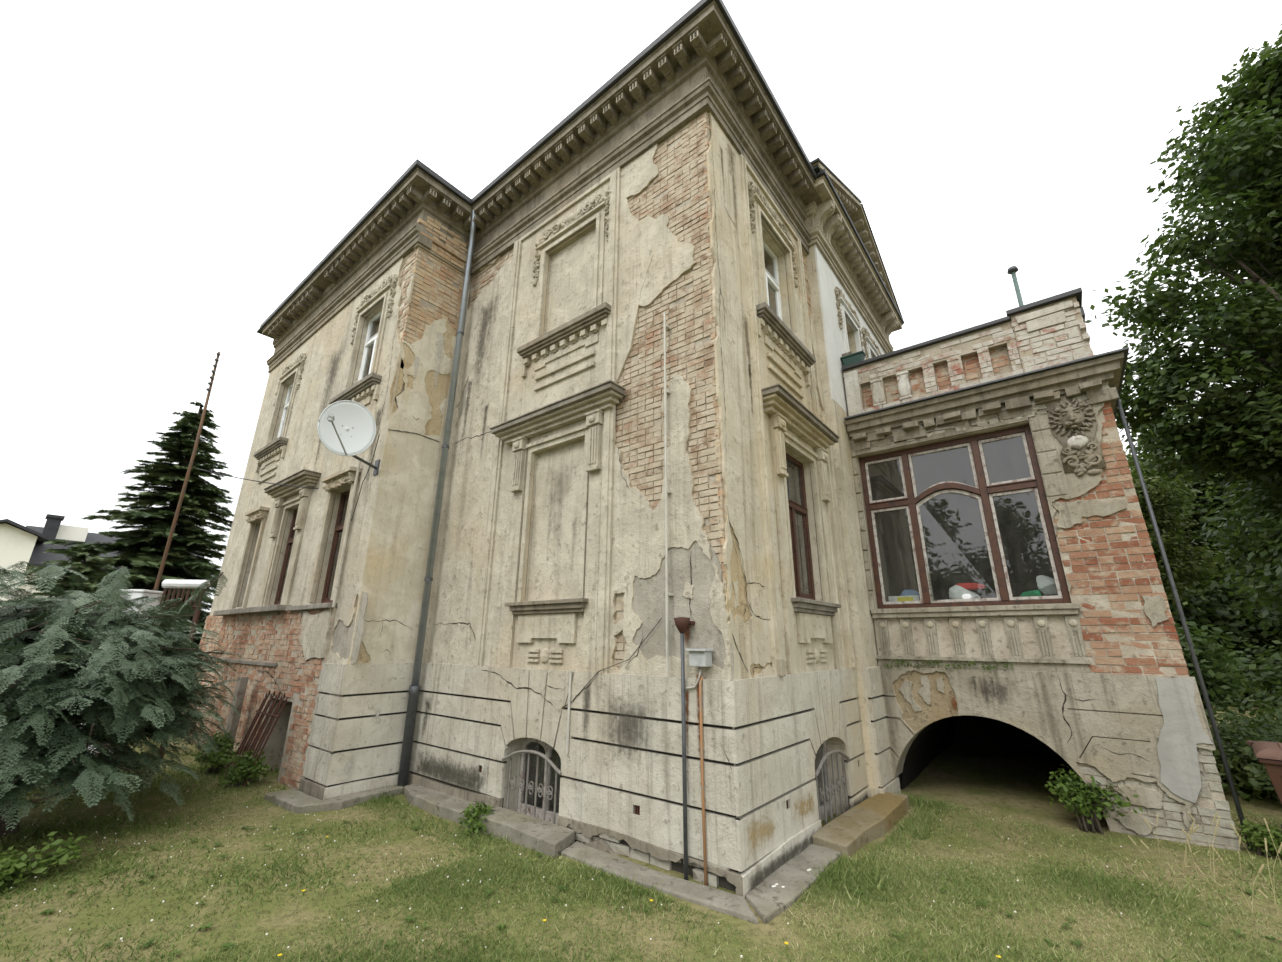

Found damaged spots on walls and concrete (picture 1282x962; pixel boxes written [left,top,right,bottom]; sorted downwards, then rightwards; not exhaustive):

flaking render [388,216,514,436]
flaking render [614,111,751,680]
flaking render [855,398,1047,452]
flaking render [1052,381,1189,677]
crack [727,507,770,675]
damp [417,757,483,793]
damp [613,707,645,751]
flaking render [892,666,958,735]
flaking render [1078,748,1241,851]